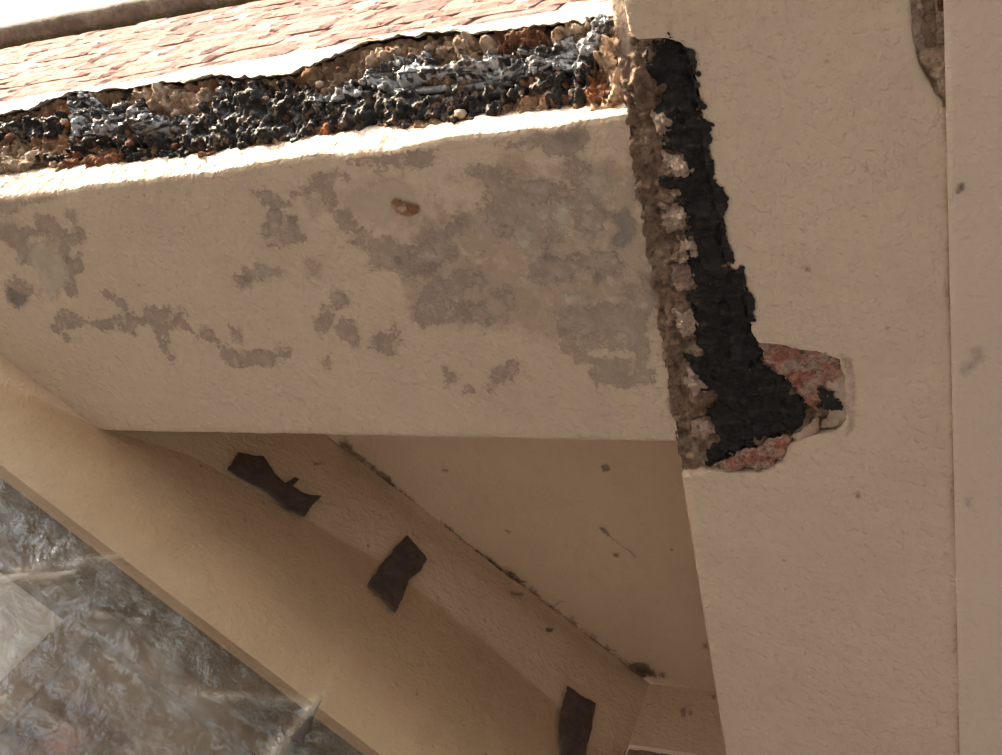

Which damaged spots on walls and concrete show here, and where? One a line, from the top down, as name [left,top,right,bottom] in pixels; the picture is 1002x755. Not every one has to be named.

spalling [909,0,946,105]
leakage [349,183,412,219]
spalling [0,0,855,472]
leakage [610,209,635,247]